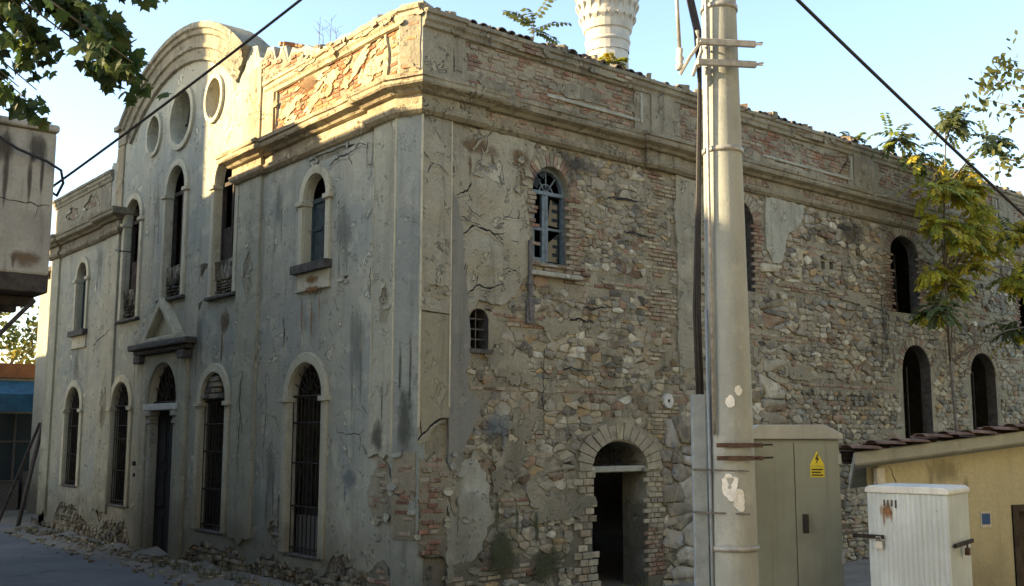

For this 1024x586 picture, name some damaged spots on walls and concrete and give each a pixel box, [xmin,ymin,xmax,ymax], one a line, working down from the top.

flaking render [260,10,424,129]
water stain [0,133,12,202]
water stain [28,137,46,199]
crack [329,142,374,170]
crack [424,133,526,297]
water stain [372,392,383,449]
water stain [399,350,412,444]
crack [416,418,445,444]
flaking render [367,448,481,586]